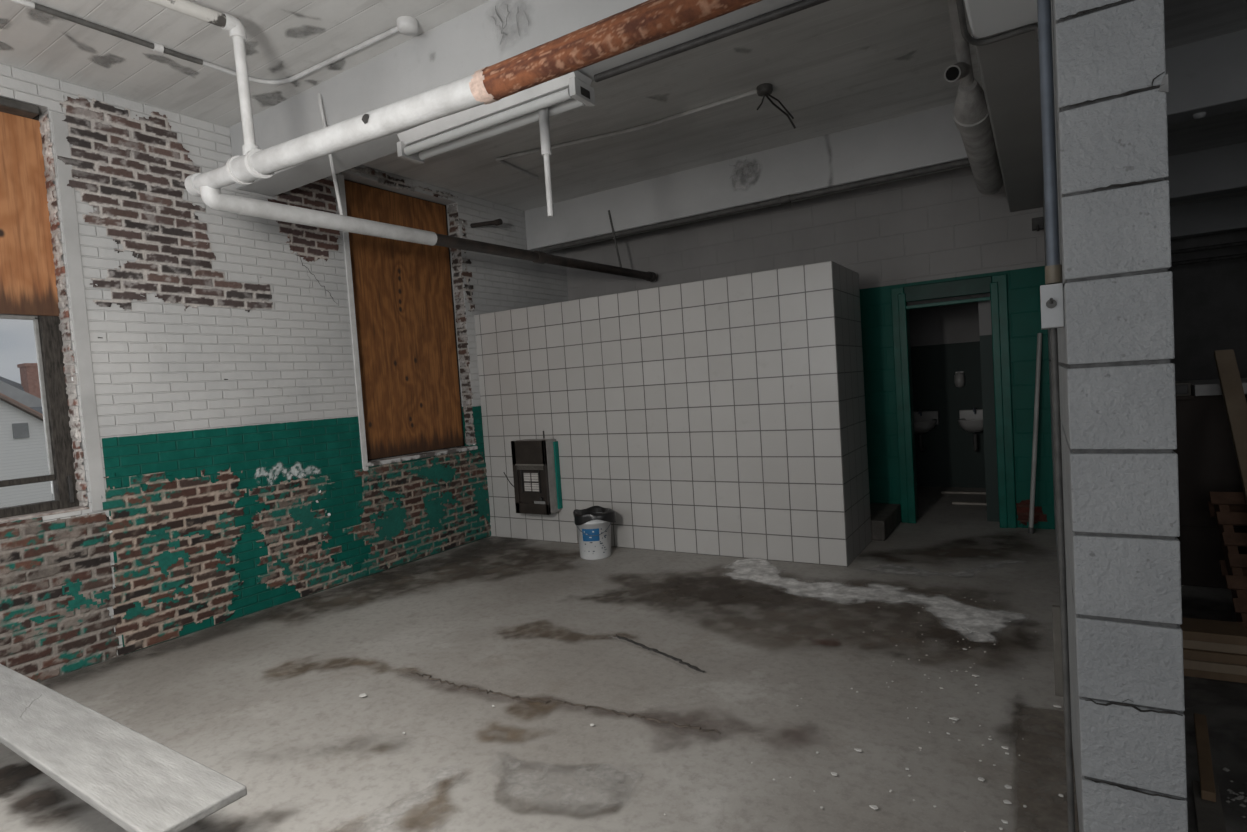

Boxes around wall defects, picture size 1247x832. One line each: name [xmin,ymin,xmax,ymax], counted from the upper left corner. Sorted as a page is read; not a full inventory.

rust [482,0,762,100]
spalling [0,92,491,682]
water stain [582,535,1032,664]